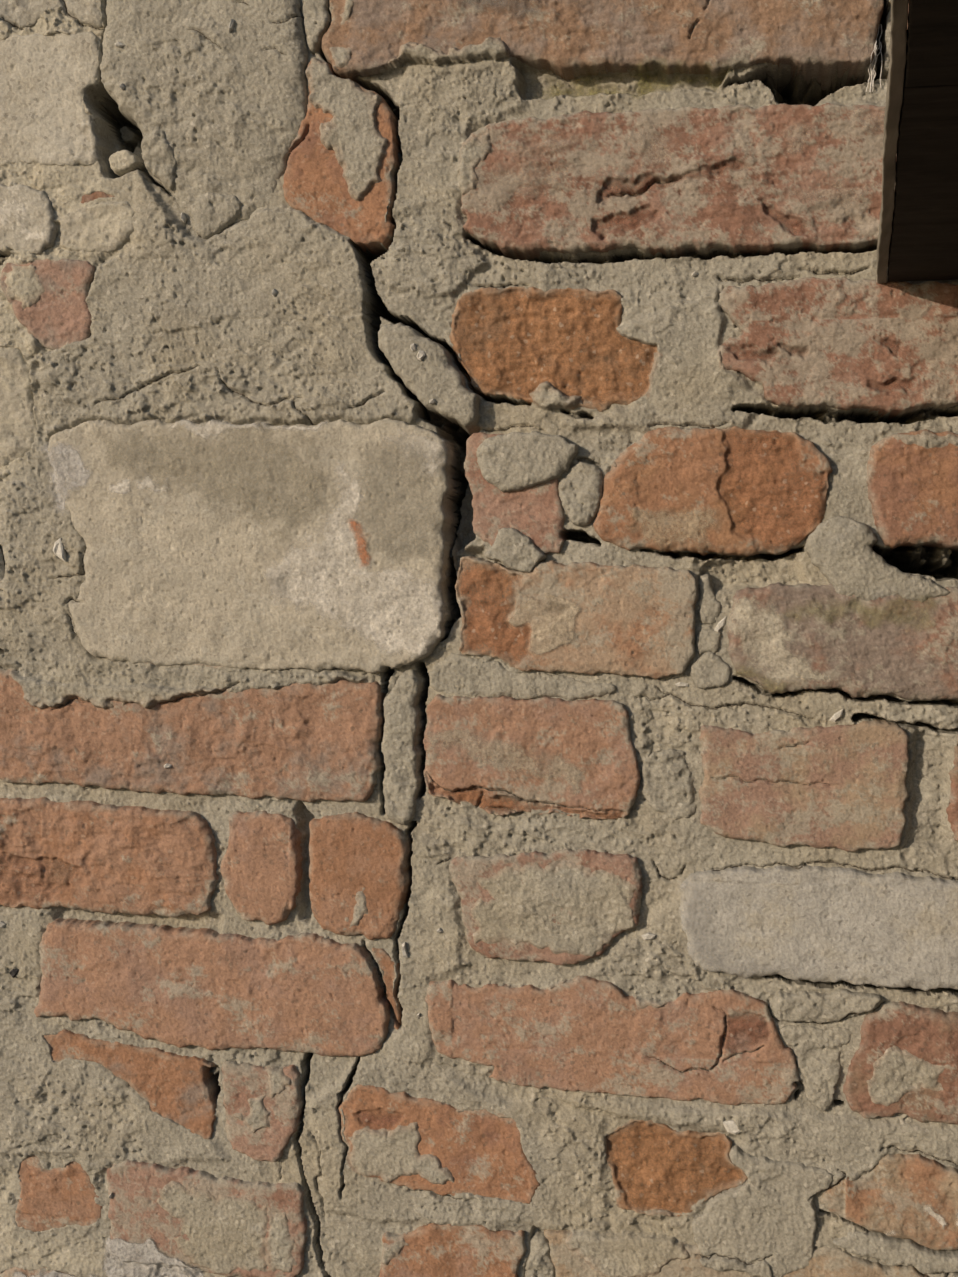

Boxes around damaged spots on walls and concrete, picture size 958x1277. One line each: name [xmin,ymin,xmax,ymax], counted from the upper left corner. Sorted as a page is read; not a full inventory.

crack [97,97,168,193]
crack [360,82,400,120]
crack [96,365,317,425]
crack [348,244,543,642]
crack [163,682,239,704]
crack [279,1119,346,1264]